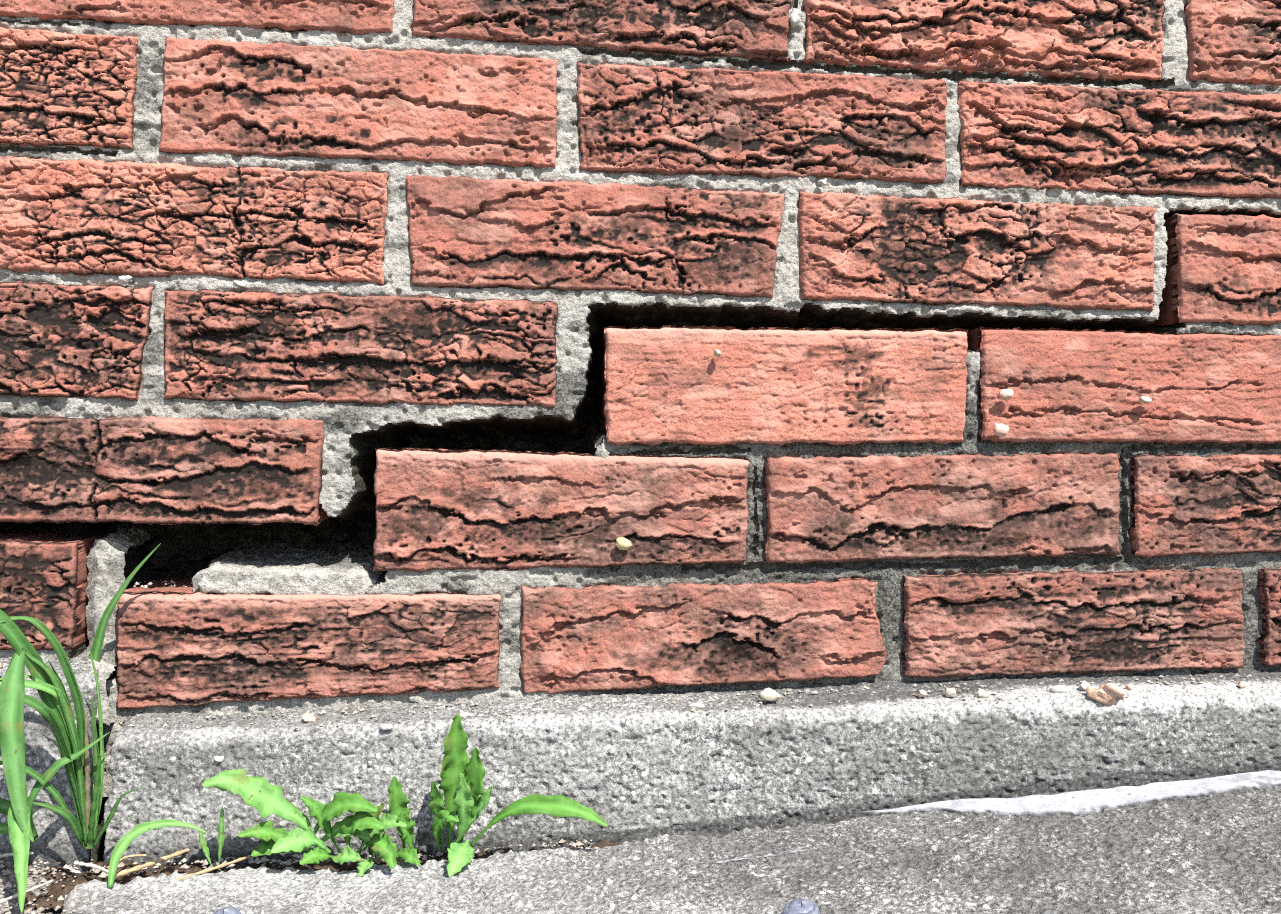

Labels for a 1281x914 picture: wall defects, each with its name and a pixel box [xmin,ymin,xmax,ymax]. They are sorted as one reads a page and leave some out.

crack [1164,208,1281,219]
crack [0,301,1281,590]
spalling [192,542,384,596]
crack [68,639,89,660]
crack [107,666,118,680]
crack [90,797,108,863]